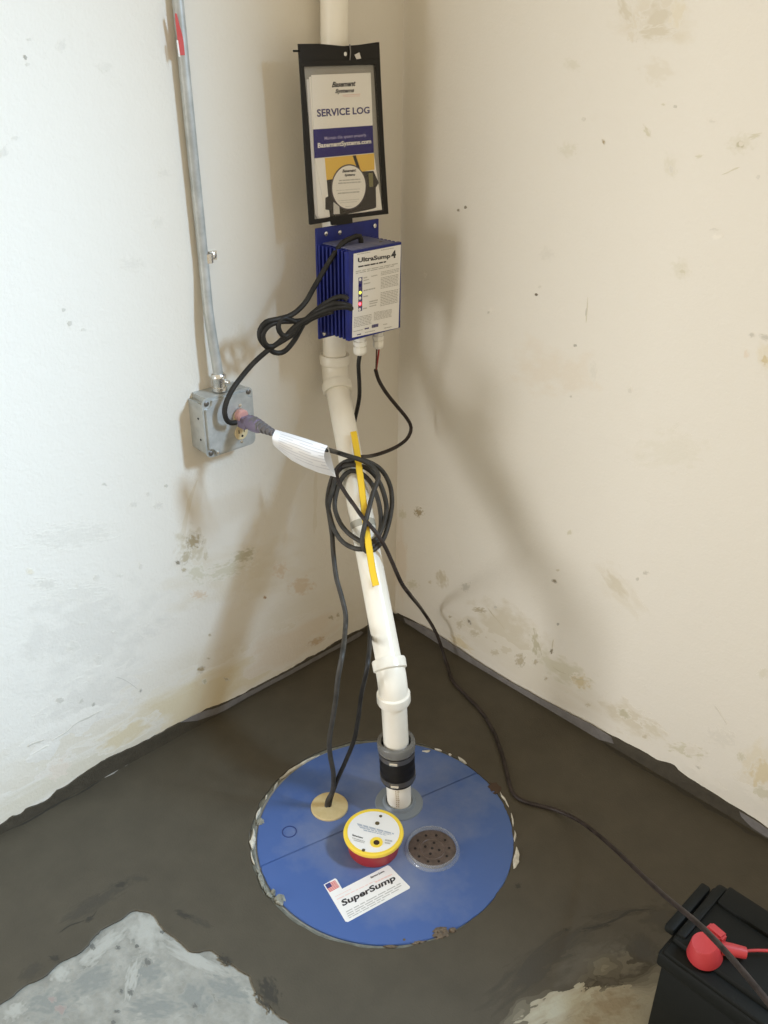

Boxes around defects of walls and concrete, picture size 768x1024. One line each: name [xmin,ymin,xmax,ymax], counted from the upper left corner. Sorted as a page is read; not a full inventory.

leakage [0,471,367,824]
leakage [406,558,670,746]
leakage [702,724,768,803]